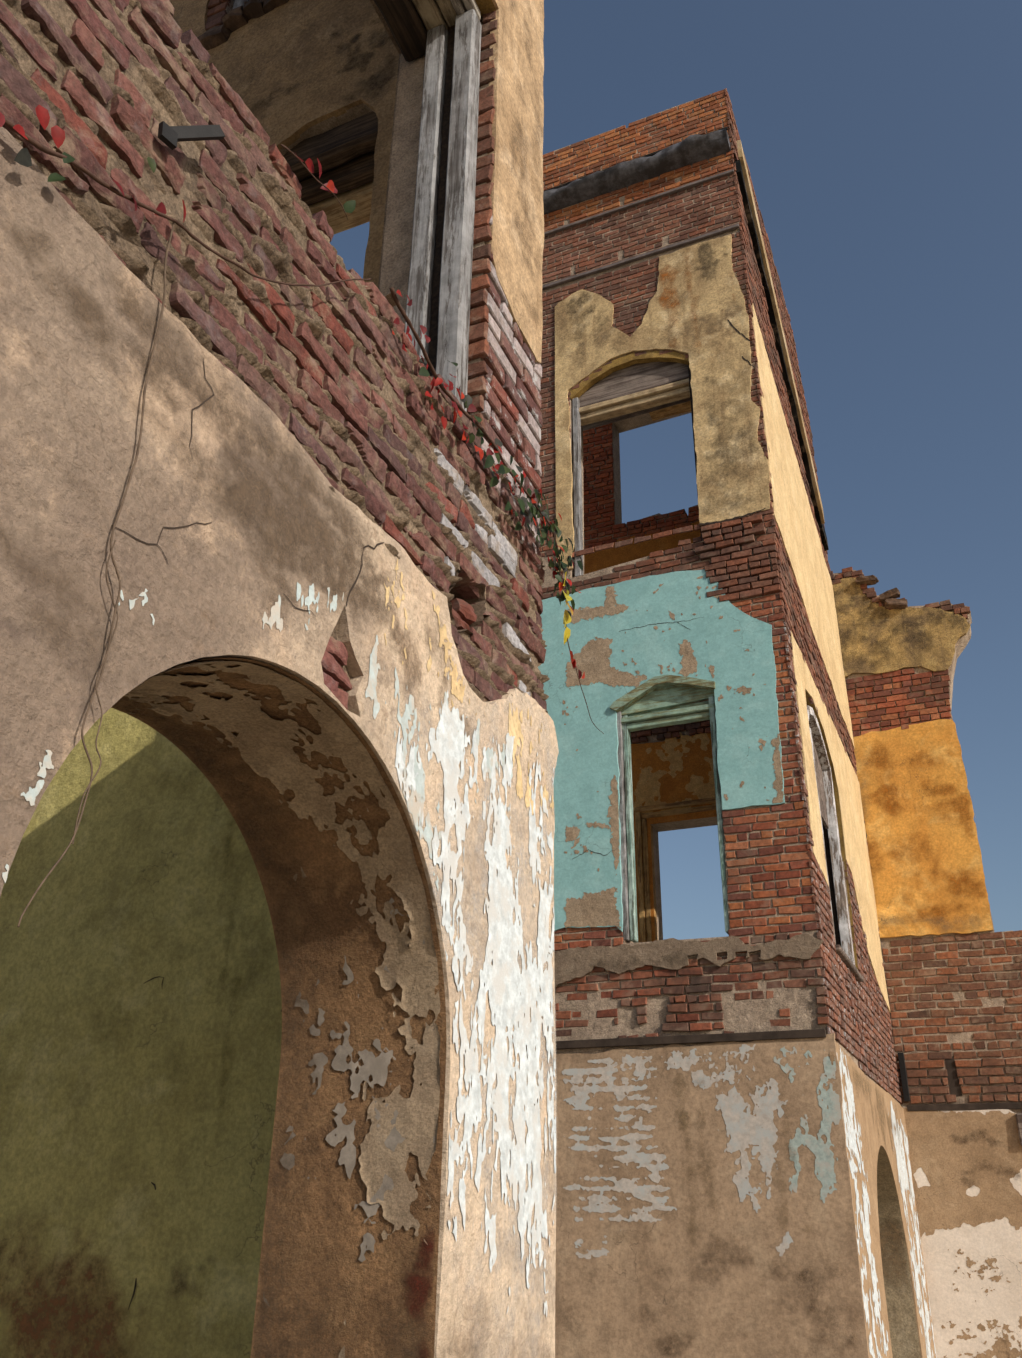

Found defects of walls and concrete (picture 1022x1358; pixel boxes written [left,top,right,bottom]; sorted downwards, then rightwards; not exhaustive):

crack [189,358,214,459]
crack [112,522,212,564]
crack [346,542,384,606]
peeling [118,559,889,1358]
peeling [888,1101,1022,1358]